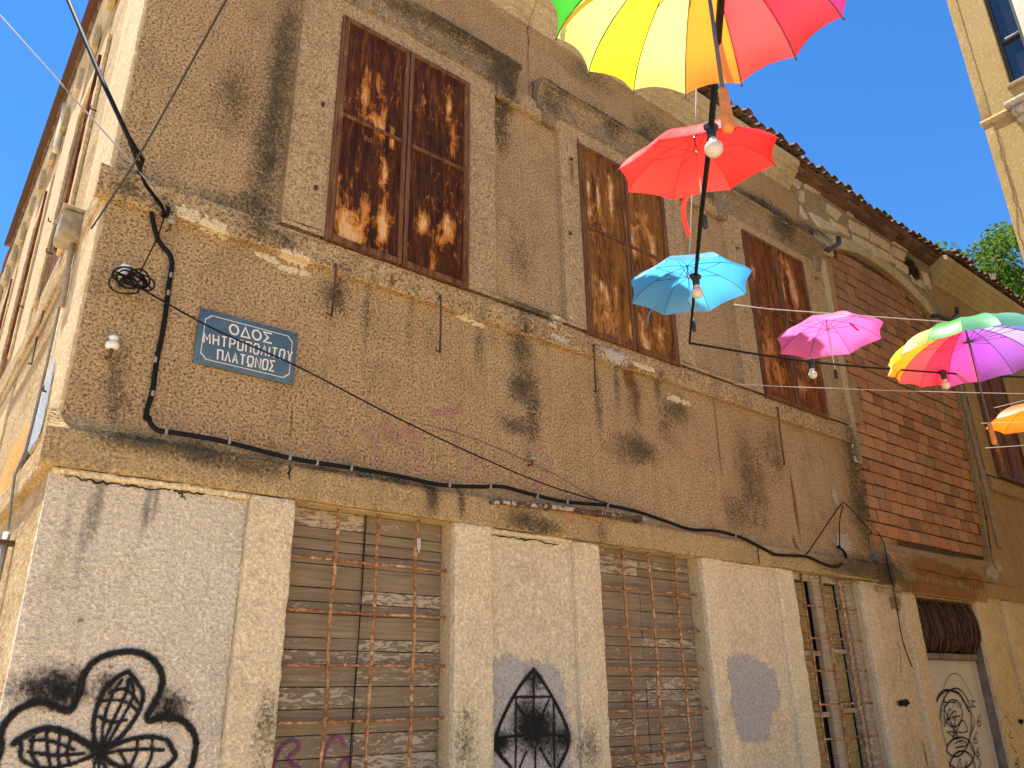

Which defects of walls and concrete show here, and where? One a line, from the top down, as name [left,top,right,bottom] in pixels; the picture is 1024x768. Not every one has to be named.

leakage [216,1,298,248]
peeling [174,204,232,241]
peeling [253,248,314,279]
leakage [502,298,553,443]
crack [64,474,243,500]
crack [492,534,559,545]